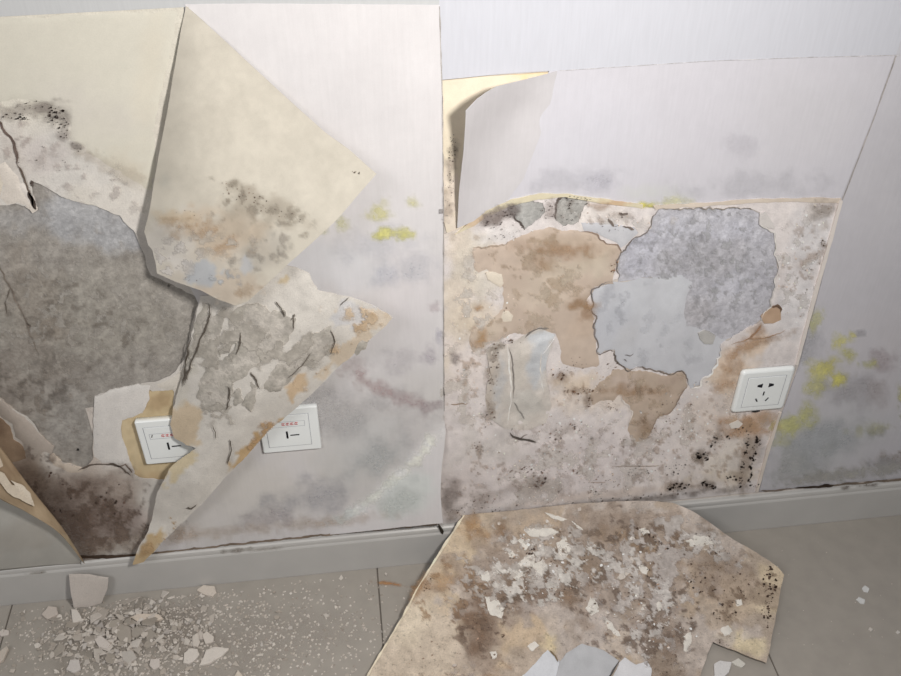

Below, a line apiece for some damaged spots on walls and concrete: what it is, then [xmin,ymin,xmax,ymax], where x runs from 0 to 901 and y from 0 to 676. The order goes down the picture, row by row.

water stain [3,101,80,152]
spalling [0,162,198,475]
spalling [513,196,782,389]
water stain [696,408,901,492]
water stain [20,469,146,561]